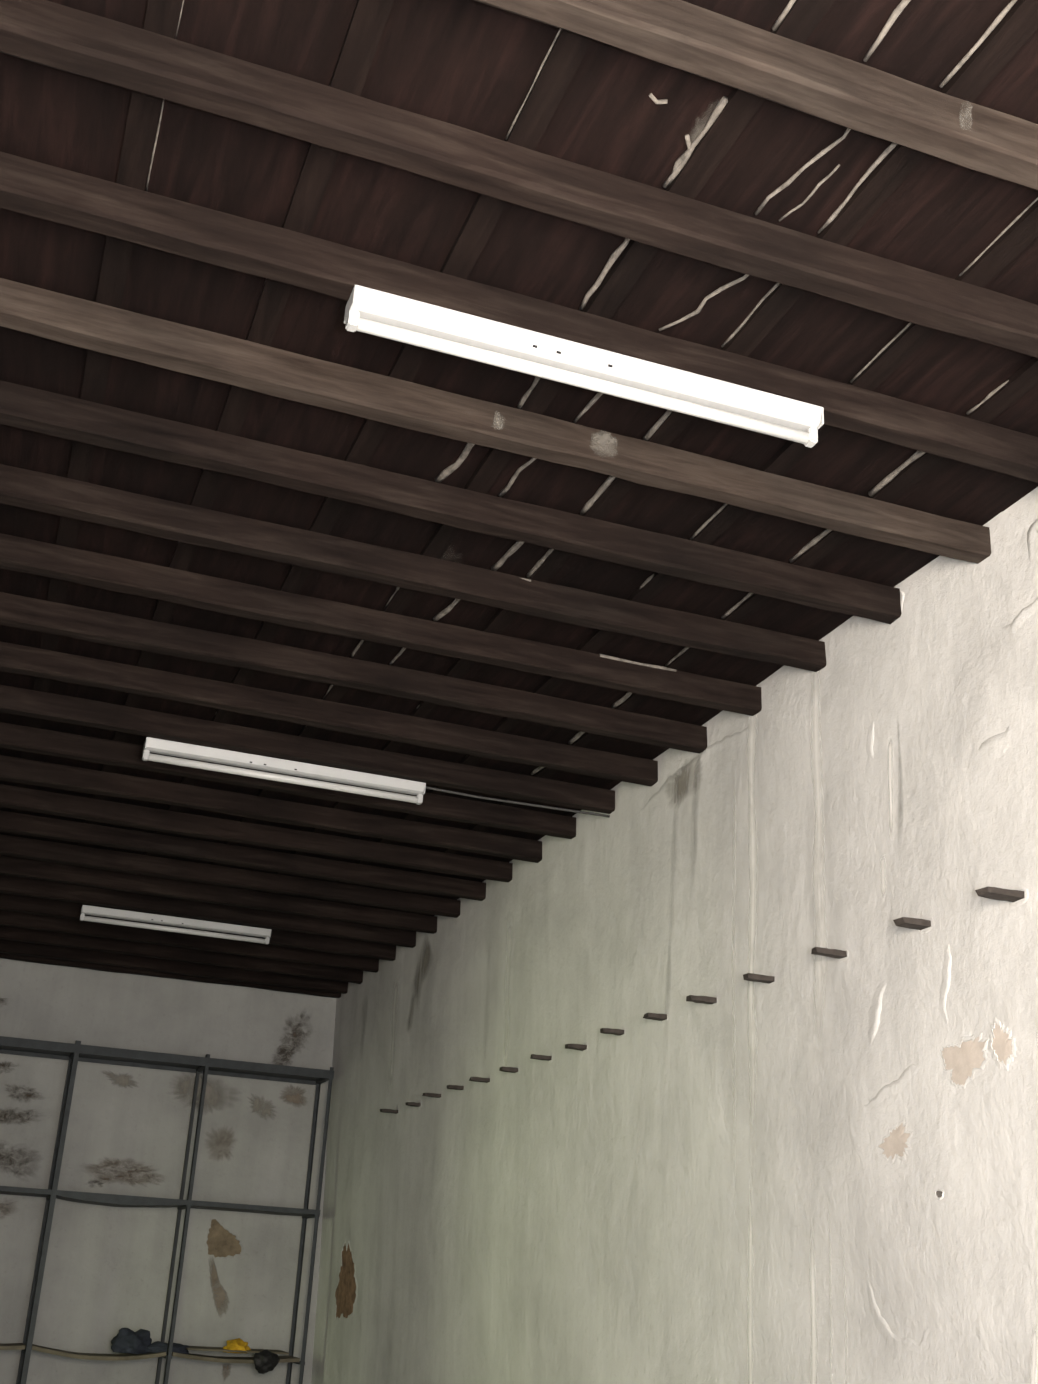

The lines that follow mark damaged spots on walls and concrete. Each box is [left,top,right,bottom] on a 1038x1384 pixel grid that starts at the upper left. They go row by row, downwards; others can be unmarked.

flaking render [939,944,952,1025]
flaking render [940,1017,1017,1089]
damp [0,1087,34,1122]
flaking render [877,1119,913,1163]
flaking render [204,1217,244,1259]
flaking render [335,1240,358,1322]